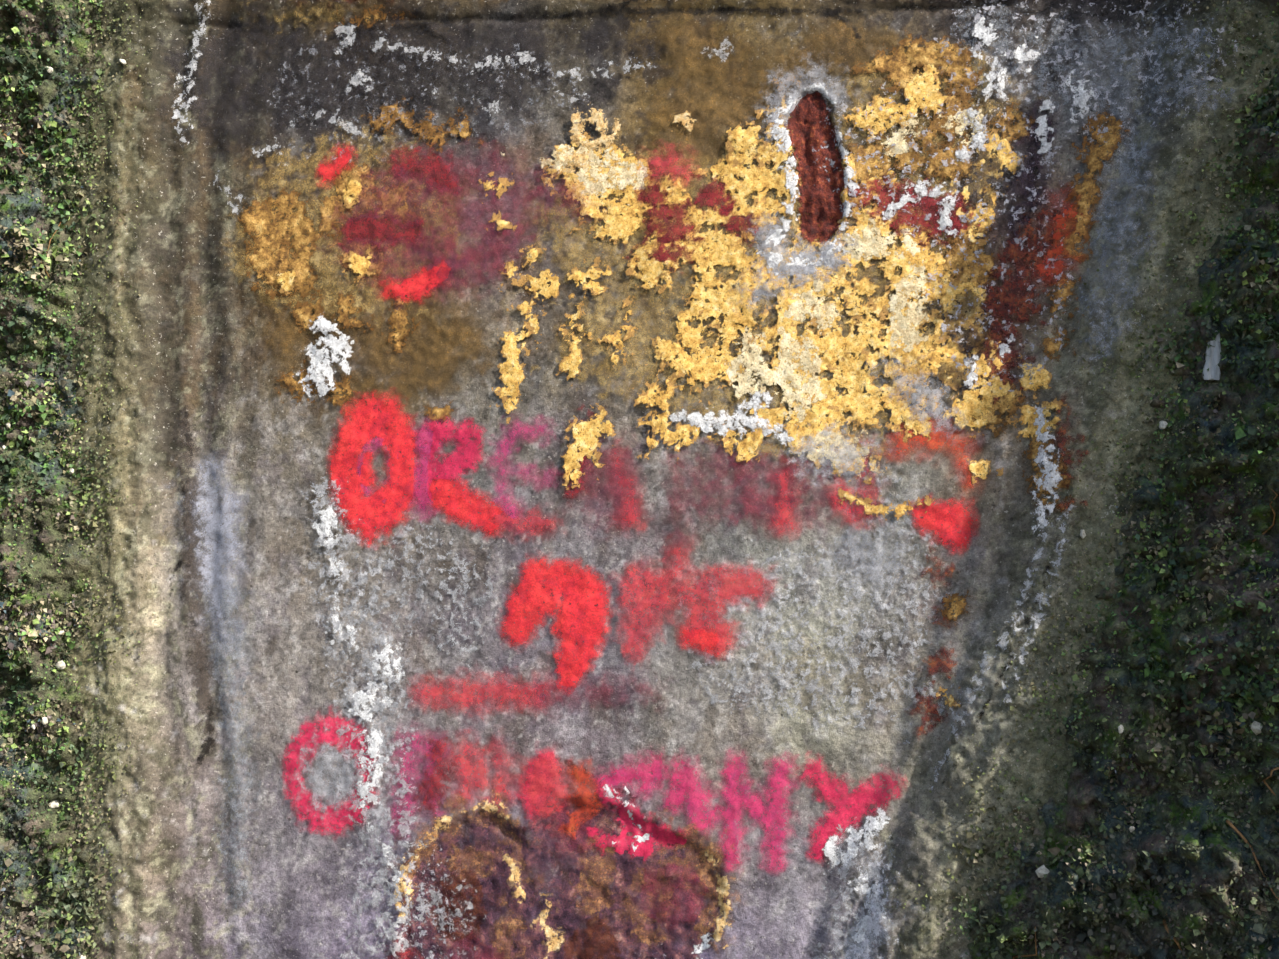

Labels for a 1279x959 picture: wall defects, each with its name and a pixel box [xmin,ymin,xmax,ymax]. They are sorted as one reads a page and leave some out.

peeling [478,172,517,231]
peeling [489,30,1130,538]
peeling [937,590,974,625]
leakage [188,461,261,908]
peeling [926,686,968,714]